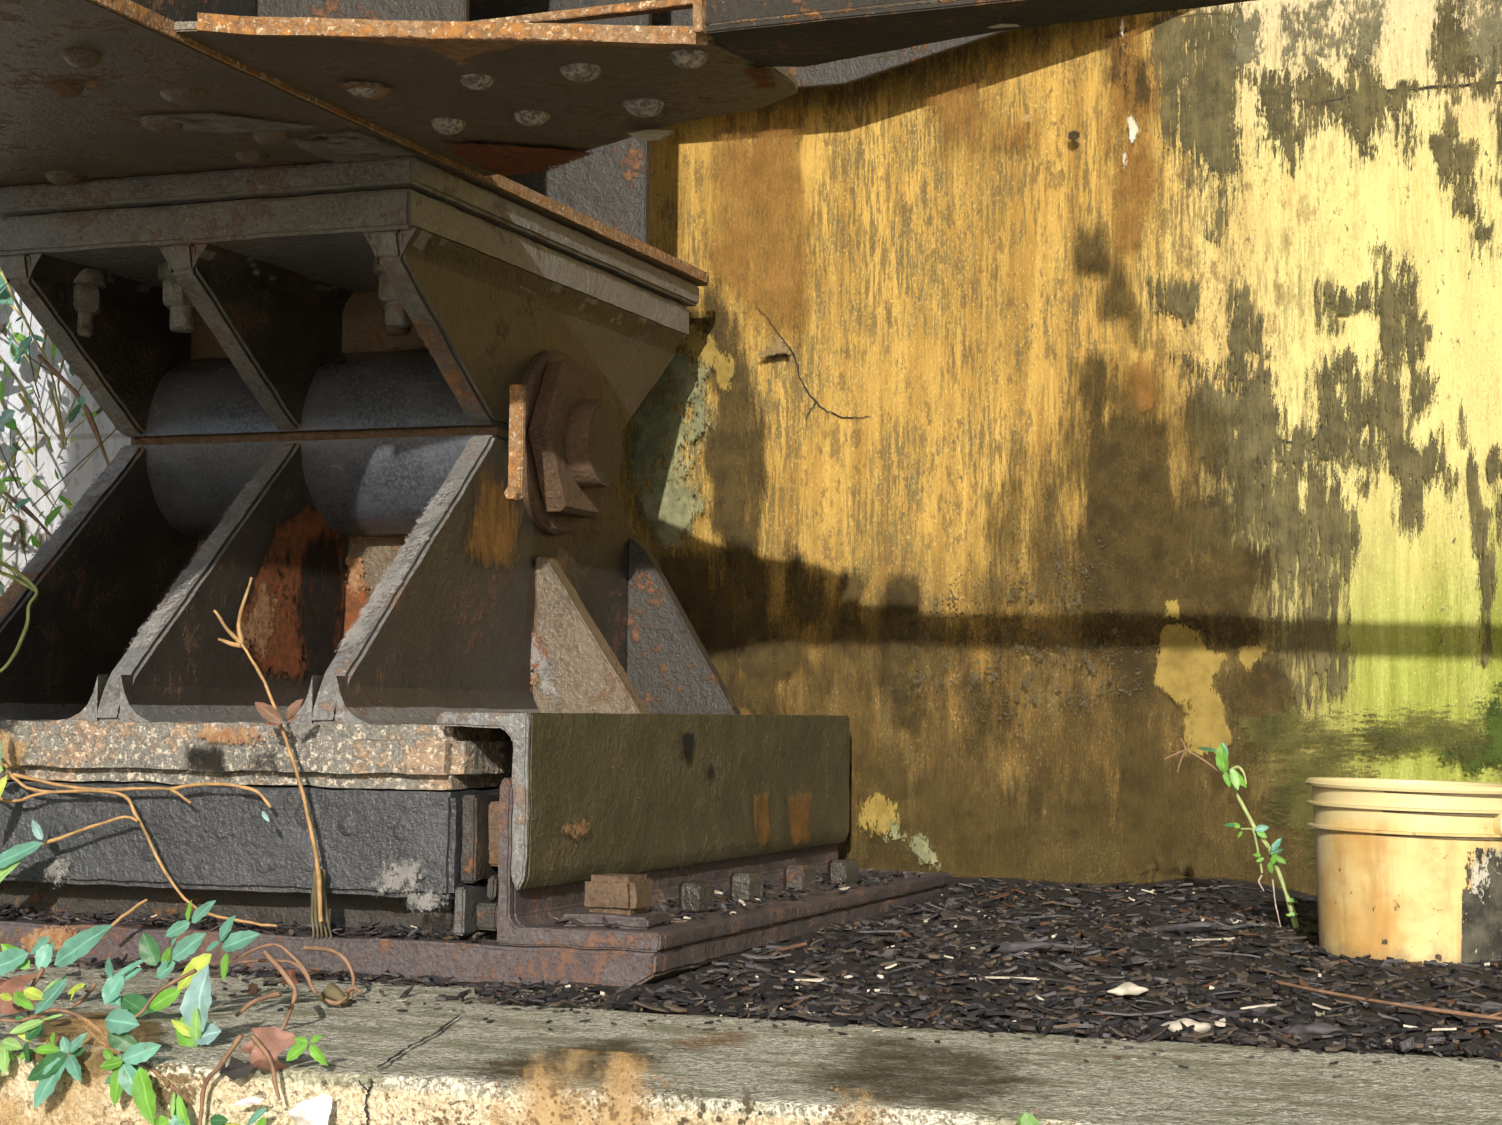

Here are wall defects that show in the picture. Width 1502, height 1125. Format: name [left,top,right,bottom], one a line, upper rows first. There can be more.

rust [315,32,704,67]
rust [709,0,958,27]
leakage [1121,0,1502,261]
crack [757,307,871,438]
leakage [655,226,1502,896]
peeling [1154,599,1268,756]
crack [357,1015,460,1125]